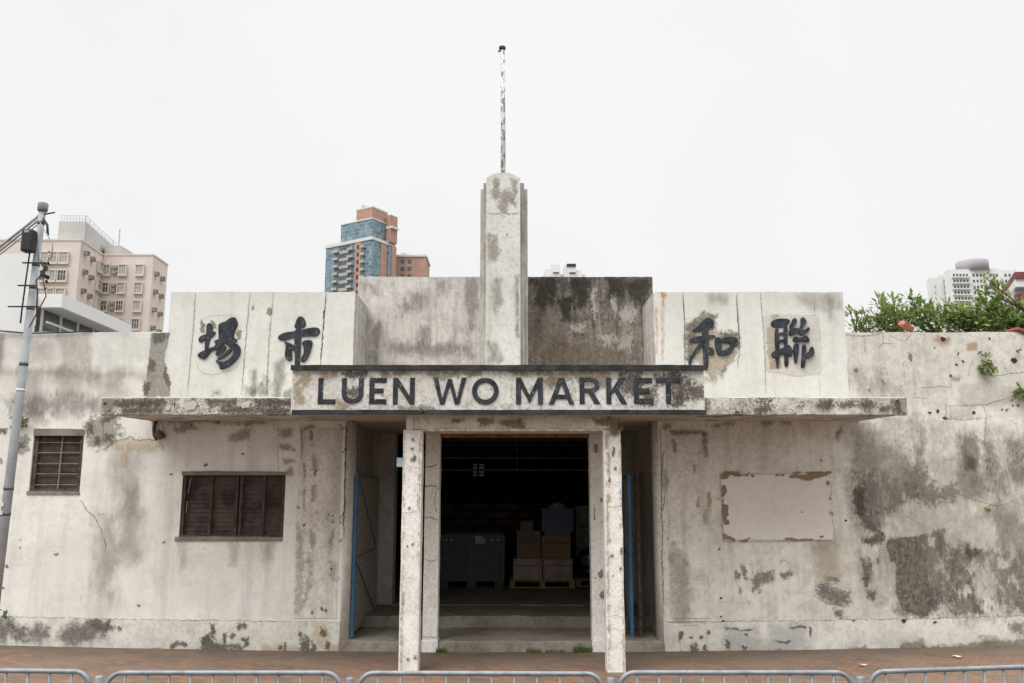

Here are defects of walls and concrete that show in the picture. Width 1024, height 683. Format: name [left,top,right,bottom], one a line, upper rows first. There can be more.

damp [517,277,651,355]
peeling [683,310,742,383]
peeling [707,471,754,550]
peeling [775,460,833,516]
damp [853,433,1024,600]
damp [900,507,1024,648]
spalling [153,623,249,650]